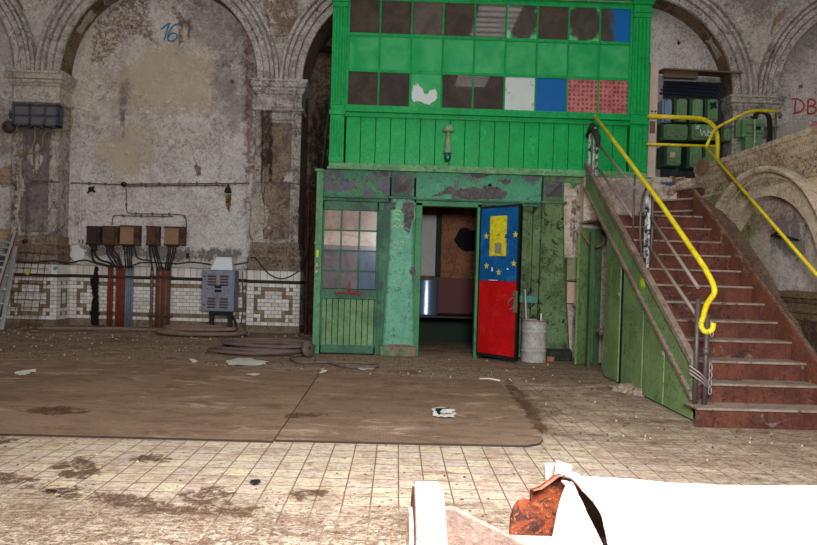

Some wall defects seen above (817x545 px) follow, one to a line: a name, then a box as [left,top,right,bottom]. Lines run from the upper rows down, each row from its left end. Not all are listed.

flaking render [0,140,61,242]
peeling [430,174,511,200]